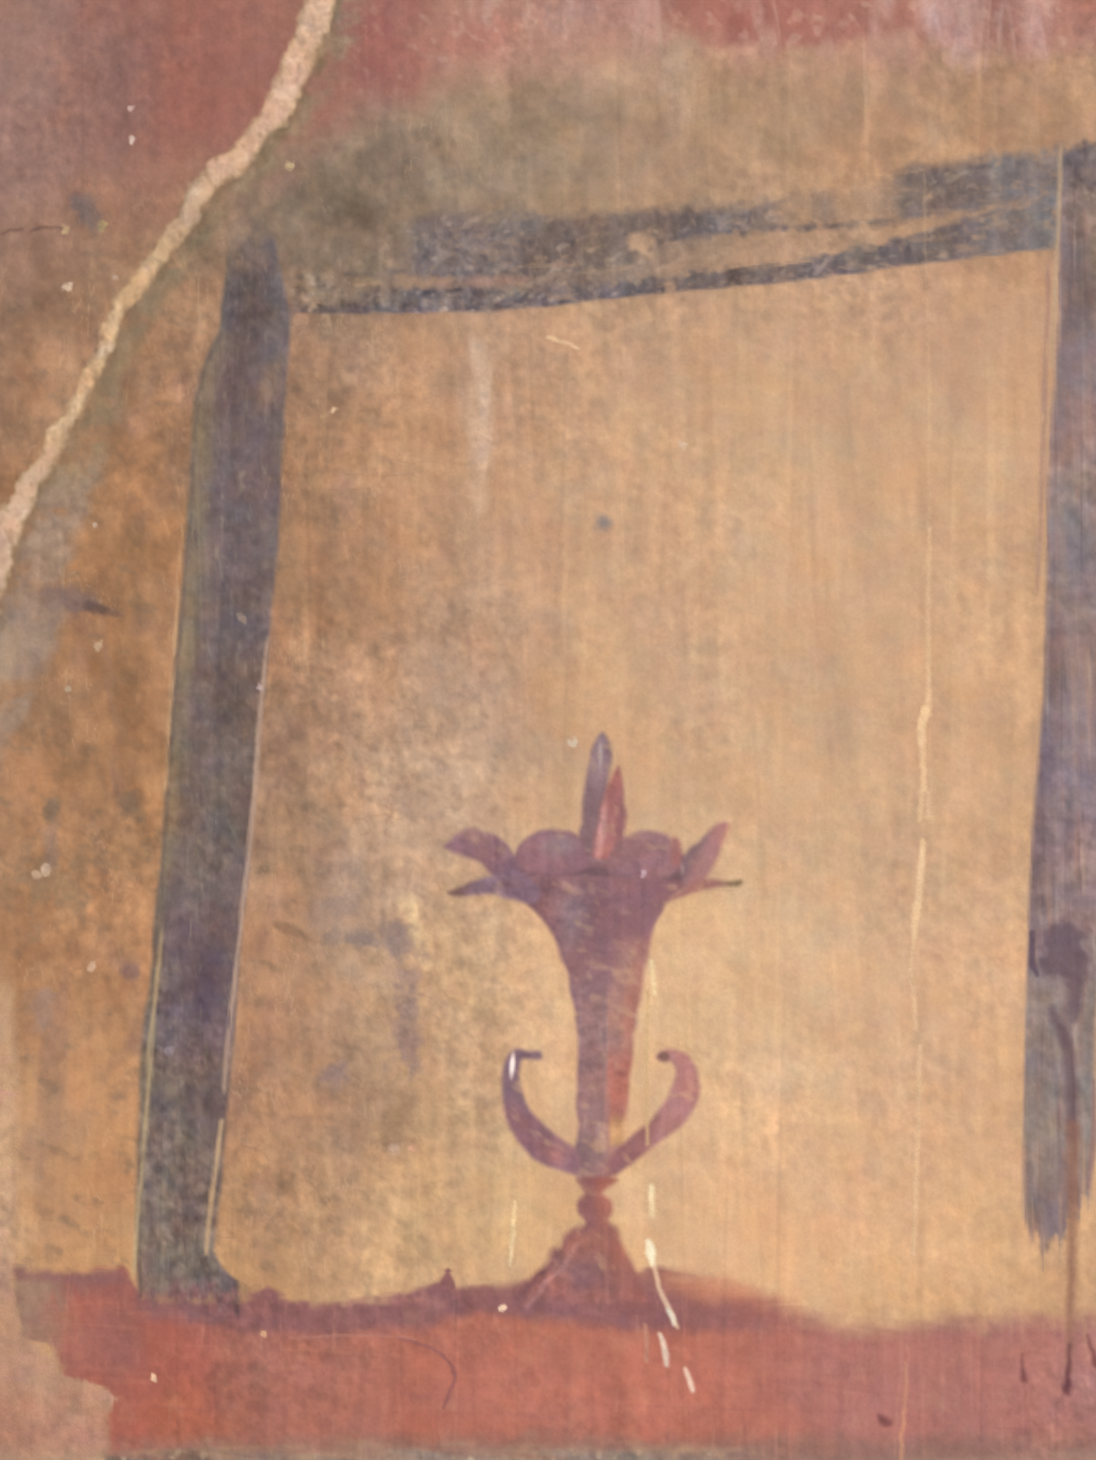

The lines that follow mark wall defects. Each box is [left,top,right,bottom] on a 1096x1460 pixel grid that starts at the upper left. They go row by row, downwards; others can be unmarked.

crack [0,0,374,780]
peeling [642,956,660,1148]
peeling [641,1182,698,1396]